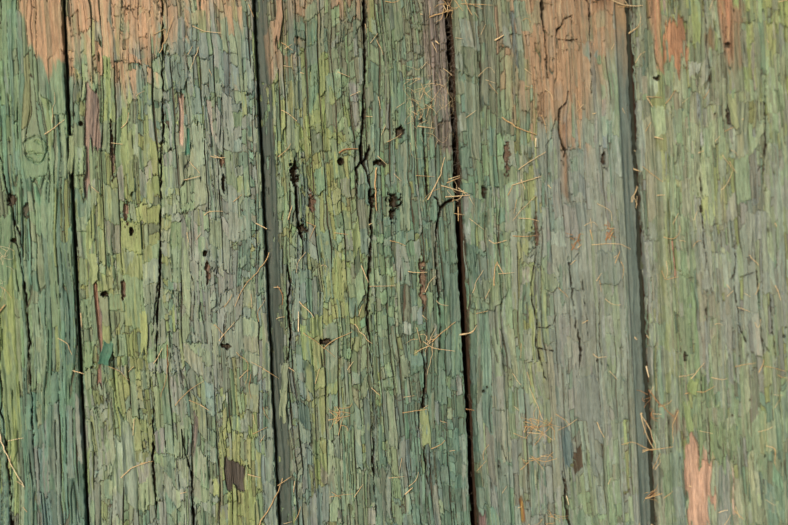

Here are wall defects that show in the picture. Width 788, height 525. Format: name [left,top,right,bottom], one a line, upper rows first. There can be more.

peeling [18,0,243,200]
peeling [264,0,370,82]
peeling [348,80,361,130]
peeling [500,0,618,151]
peeling [648,0,690,81]
crack [355,0,378,518]
crack [417,110,455,485]
peeling [682,377,735,525]